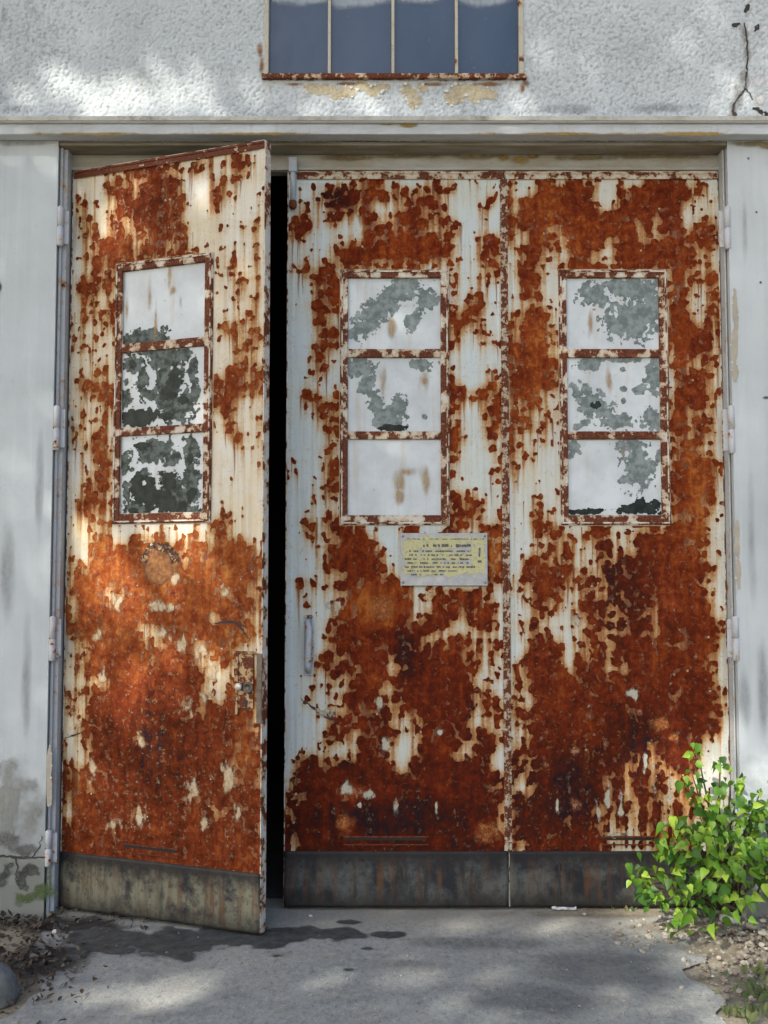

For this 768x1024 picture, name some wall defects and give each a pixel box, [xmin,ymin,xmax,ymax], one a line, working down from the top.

crack [732,4,768,116]
peeling [302,81,429,110]
peeling [443,82,498,106]
leakage [0,762,40,891]
leakage [68,920,406,961]